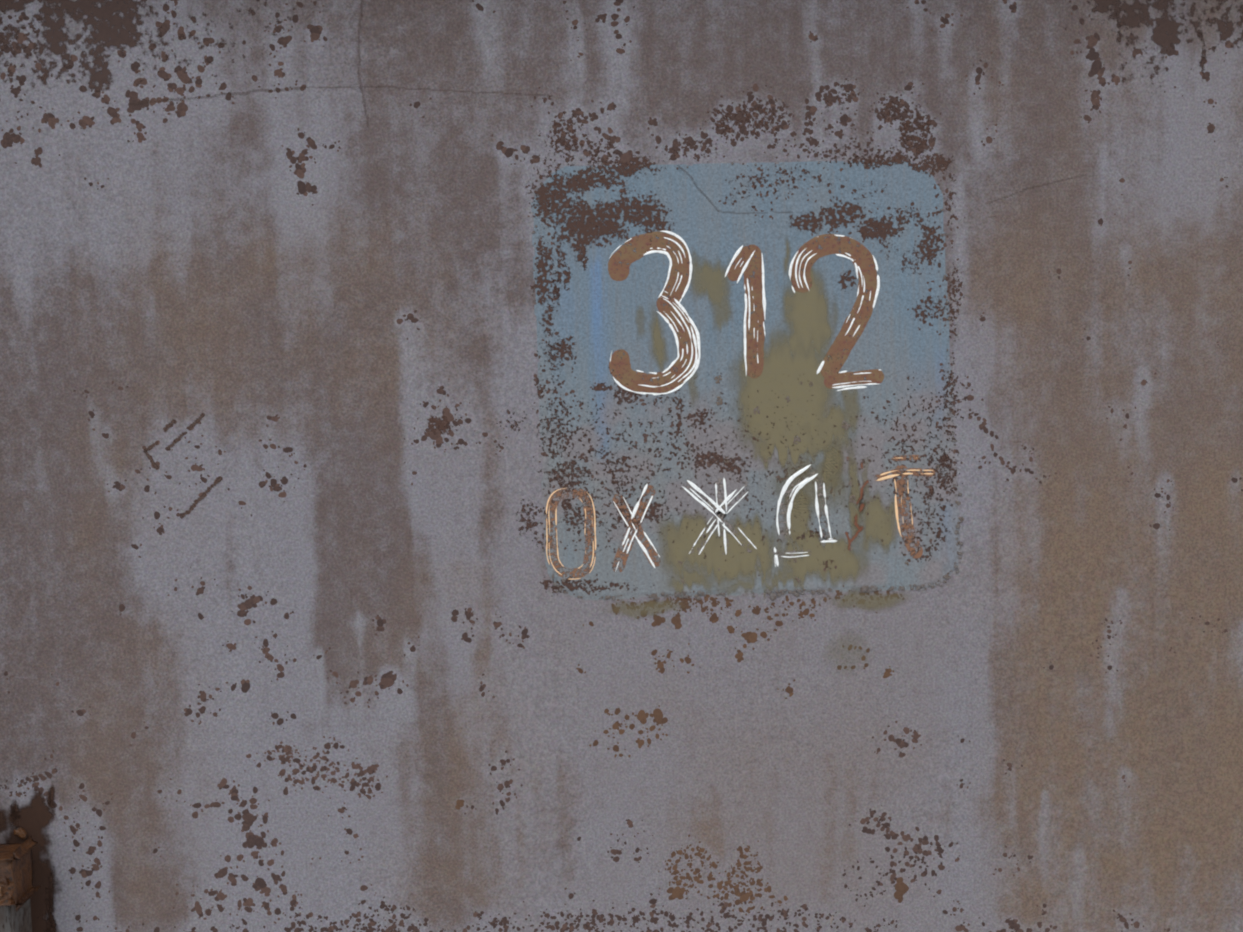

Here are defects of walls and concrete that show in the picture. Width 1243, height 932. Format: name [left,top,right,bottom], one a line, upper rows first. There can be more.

peeling [114,85,211,143]
leakage [652,317,665,367]
peeling [496,152,966,597]
leakage [664,263,895,597]